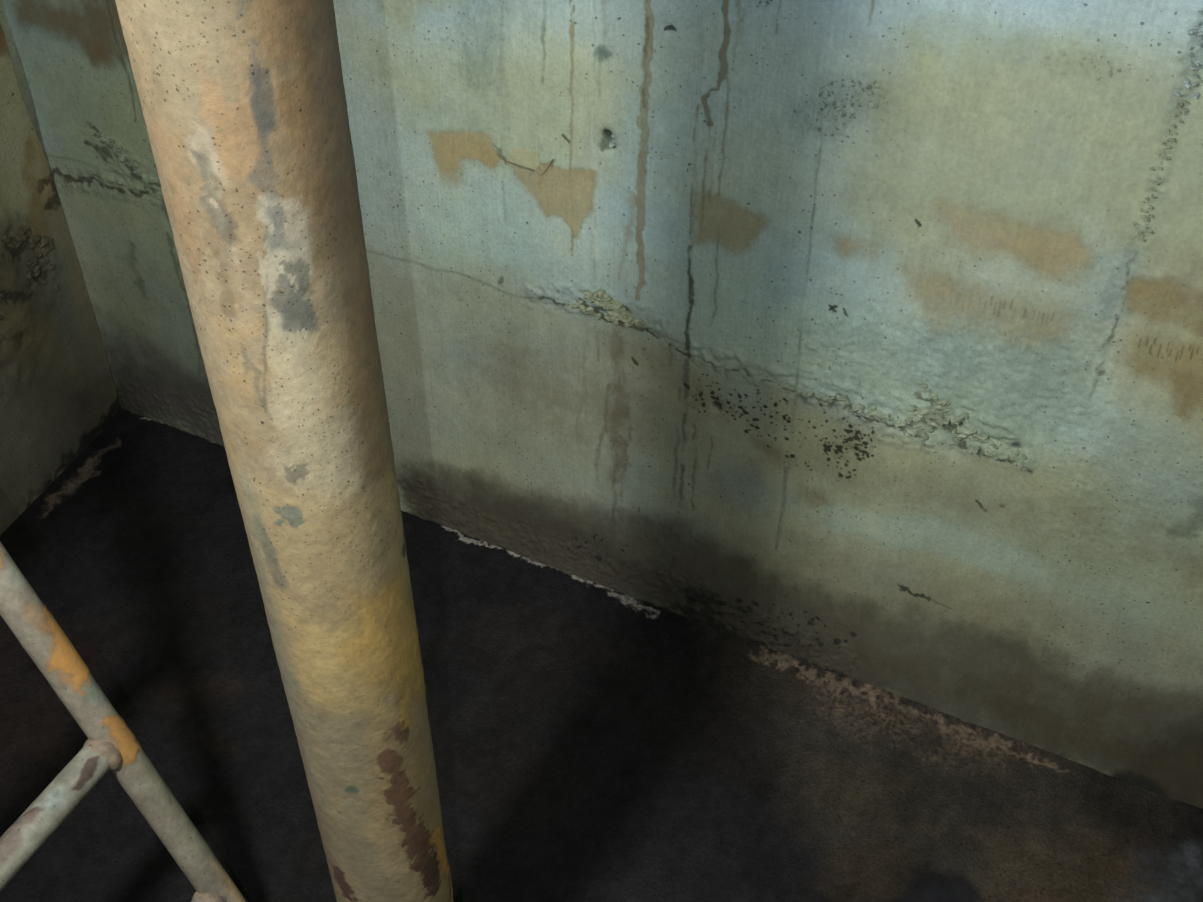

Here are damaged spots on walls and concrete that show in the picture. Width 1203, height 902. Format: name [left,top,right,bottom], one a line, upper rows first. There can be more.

crack [52,167,161,197]
peeling [497,148,554,175]
corrosion [636,0,654,299]
water stain [684,247,694,398]
corrosion [350,582,453,902]
water stain [401,469,1203,809]